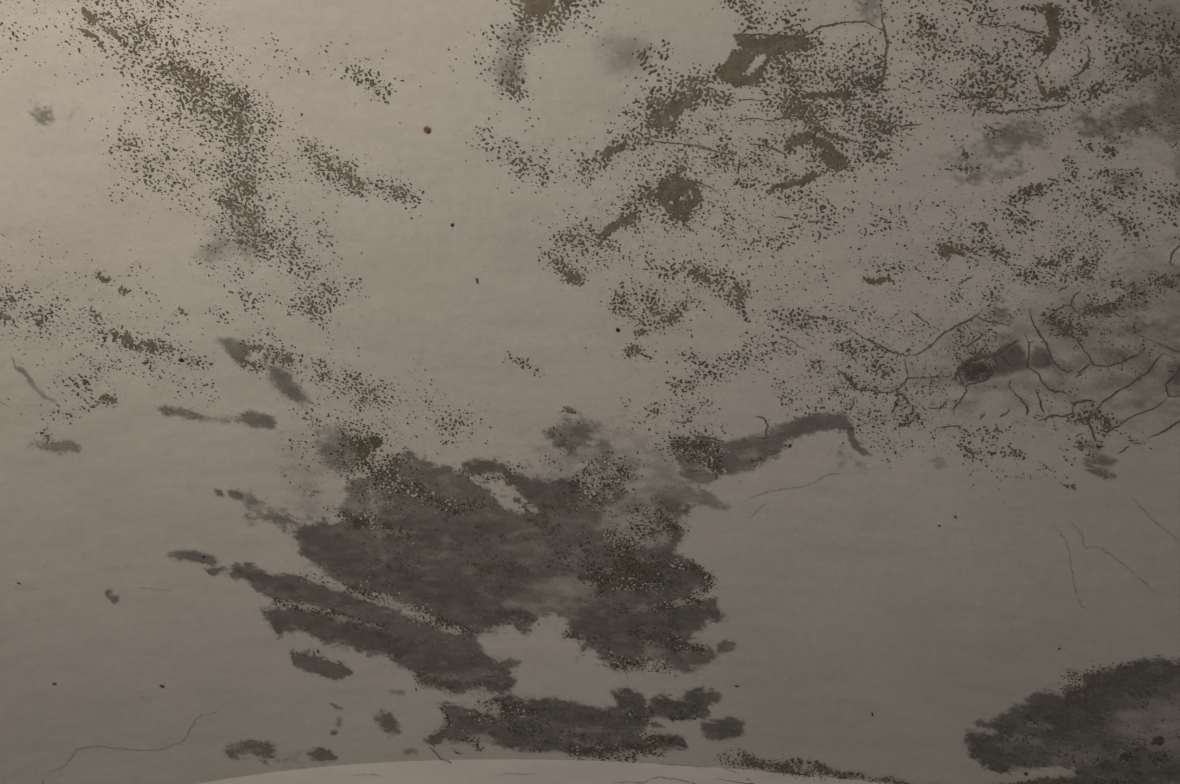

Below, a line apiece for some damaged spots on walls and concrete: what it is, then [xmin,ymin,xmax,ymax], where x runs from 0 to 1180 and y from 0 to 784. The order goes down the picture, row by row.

crack [734,4,888,86]
crack [949,24,1066,114]
crack [1071,44,1090,77]
damp [160,406,203,419]
crack [807,286,1180,453]
damp [962,345,1050,381]
damp [174,398,868,764]
damp [965,655,1180,784]